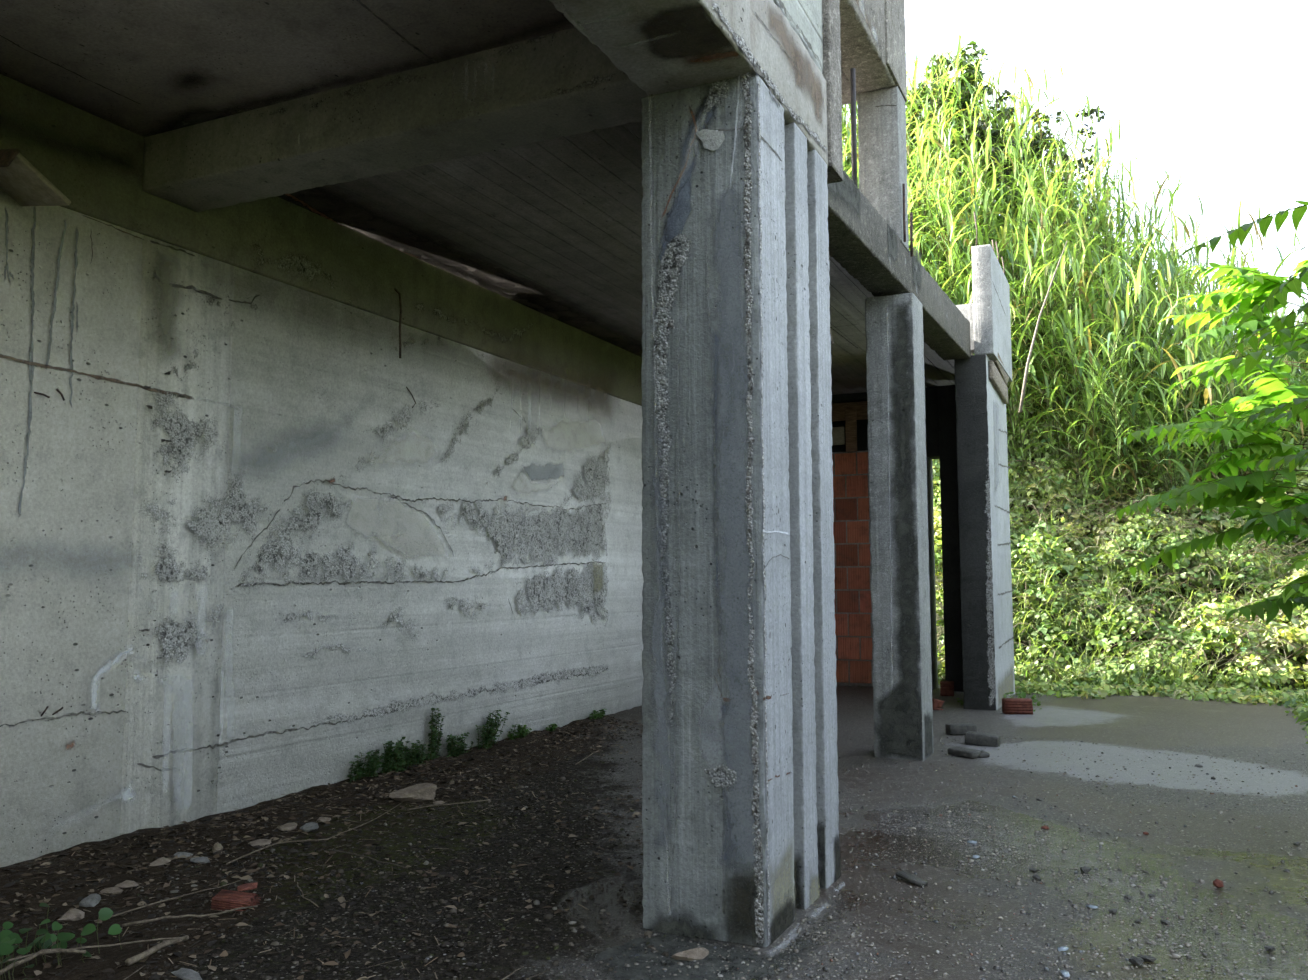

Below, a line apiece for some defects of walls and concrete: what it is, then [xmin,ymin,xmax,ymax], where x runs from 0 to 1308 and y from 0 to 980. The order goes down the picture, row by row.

water stain [641,5,740,63]
water stain [18,207,93,515]
crack [0,354,192,399]
crack [234,480,606,613]
crack [0,710,126,727]
crack [138,665,608,771]